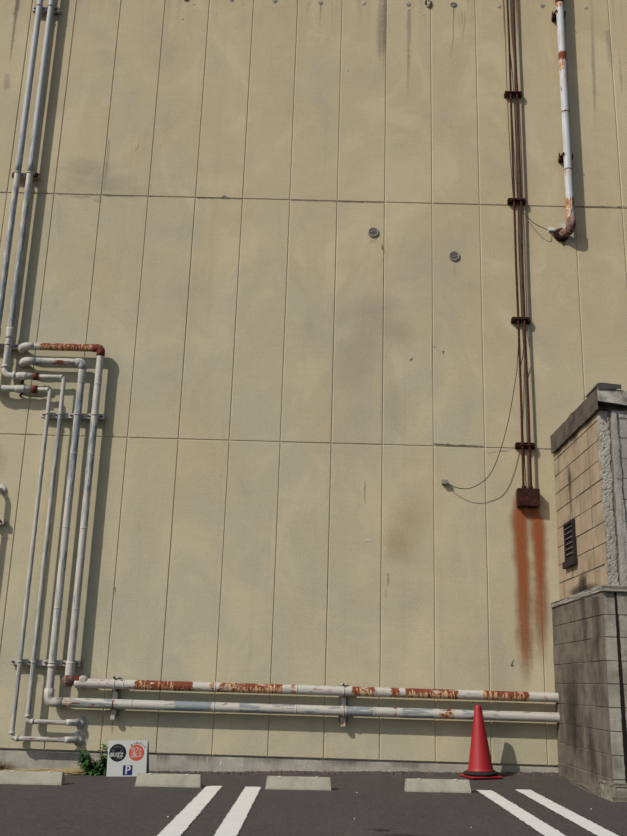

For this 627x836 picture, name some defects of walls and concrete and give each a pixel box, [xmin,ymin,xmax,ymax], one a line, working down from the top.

corrosion [513,501,544,652]